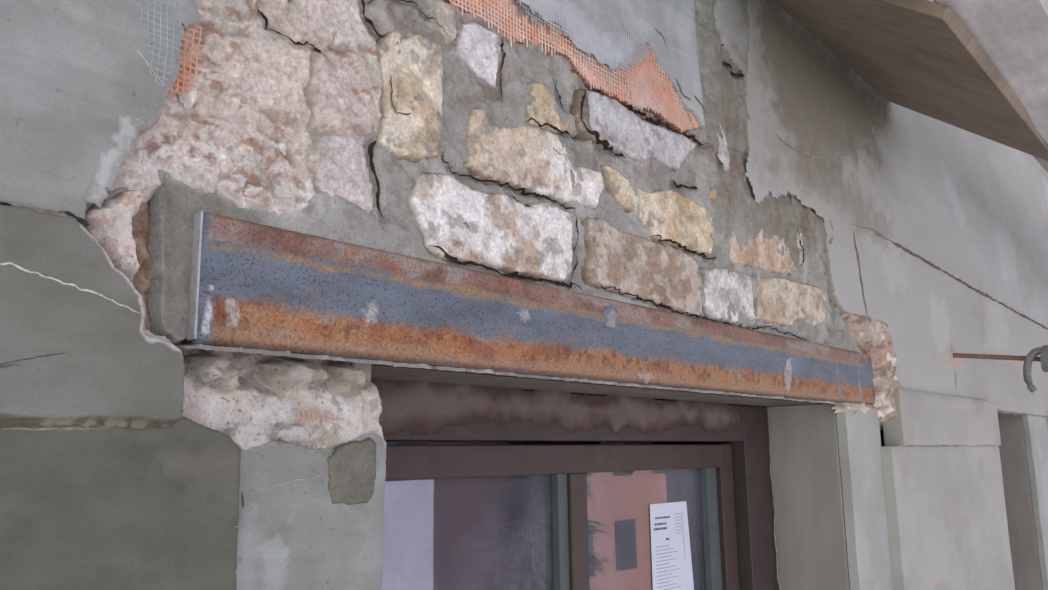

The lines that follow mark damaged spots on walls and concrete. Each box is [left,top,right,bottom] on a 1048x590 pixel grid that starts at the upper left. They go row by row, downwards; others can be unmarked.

crack [0,201,89,226]
spalling [84,0,382,336]
spalling [717,123,730,171]
crack [0,353,63,367]
crack [0,262,144,315]
spalling [172,341,386,450]
corrosion [197,212,875,405]
spalling [832,313,903,431]
crack [852,224,1048,329]